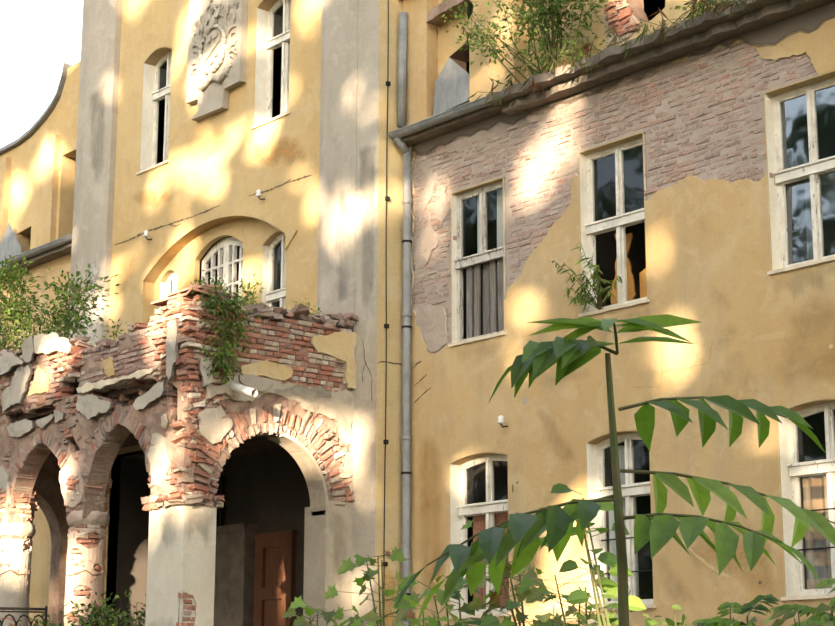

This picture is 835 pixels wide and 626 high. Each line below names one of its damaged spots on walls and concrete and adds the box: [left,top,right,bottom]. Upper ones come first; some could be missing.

spalling [411,43,819,354]
peeling [83,264,99,344]
flaking render [0,332,71,437]
flaking render [69,320,179,487]
flaking render [198,332,357,497]
flaking render [0,466,10,510]
flaking render [59,440,85,508]
flaking render [519,603,577,622]